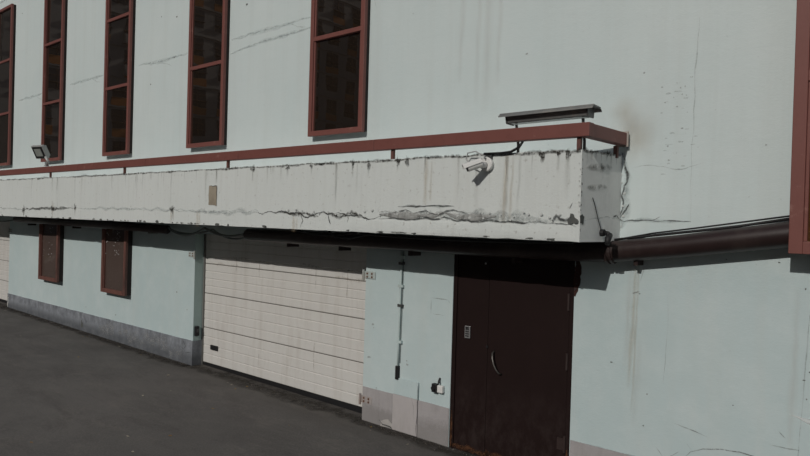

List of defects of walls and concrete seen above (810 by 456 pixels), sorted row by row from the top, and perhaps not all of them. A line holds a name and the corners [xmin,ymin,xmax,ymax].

damp [208,153,488,171]
damp [499,148,621,159]
spalling [379,168,584,226]
crack [614,153,687,238]